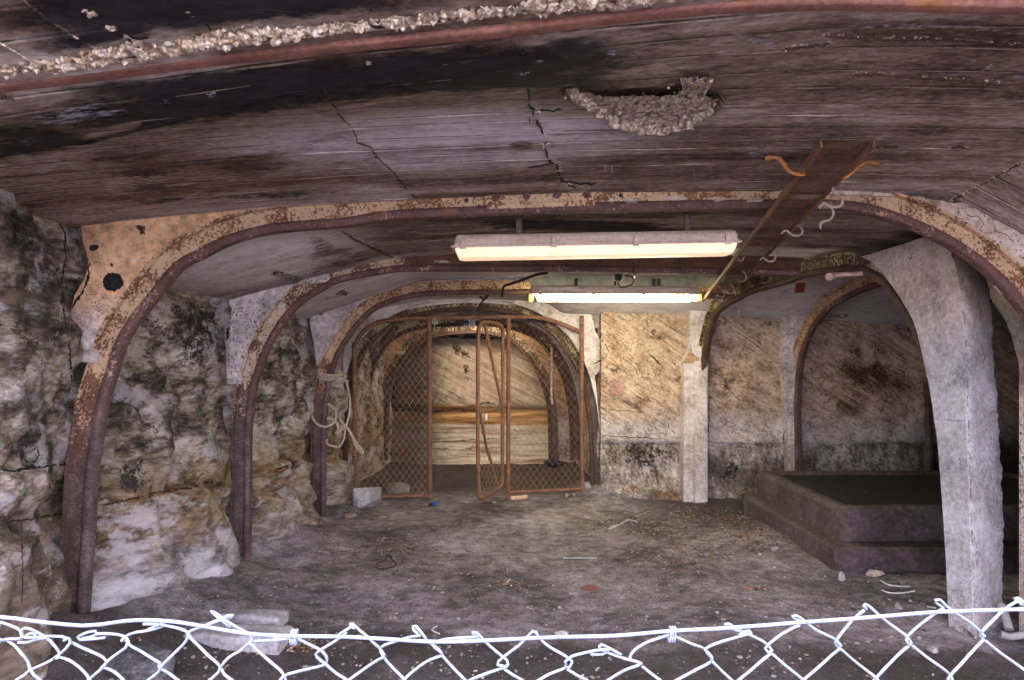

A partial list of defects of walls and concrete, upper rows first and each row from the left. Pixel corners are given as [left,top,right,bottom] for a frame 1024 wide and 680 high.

water stain [21,103,126,145]
crack [324,87,416,197]
crack [515,45,597,189]
water stain [93,149,190,205]
water stain [217,191,335,200]